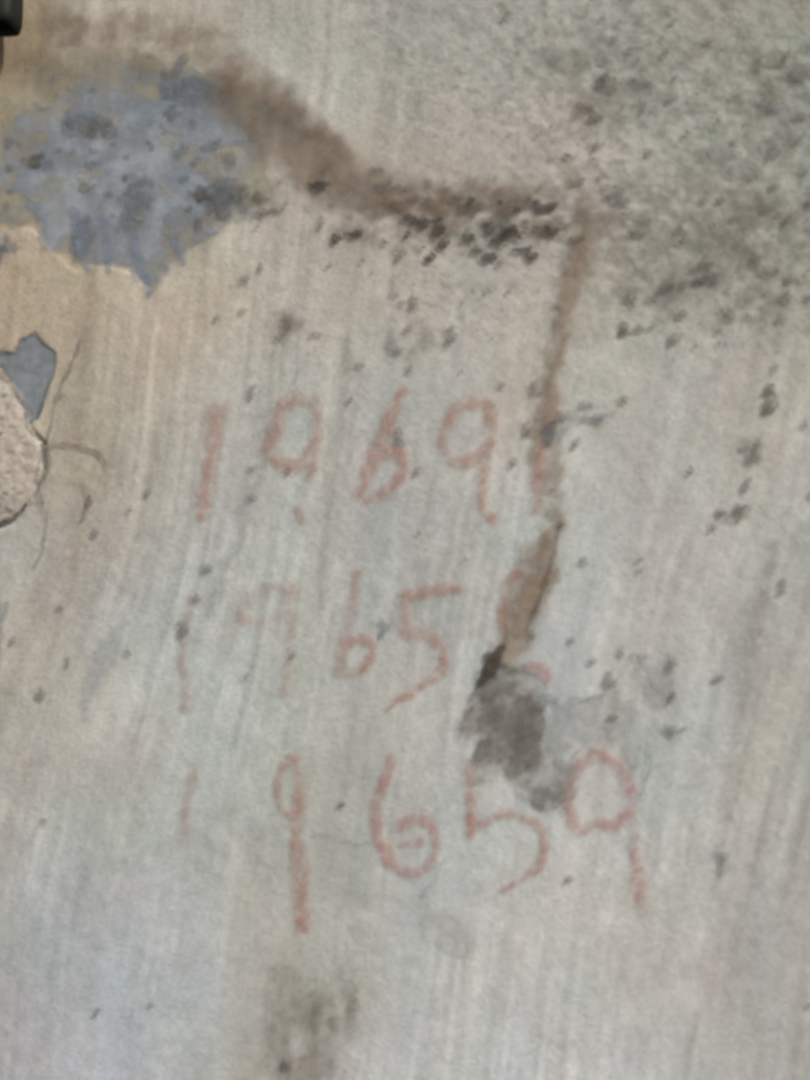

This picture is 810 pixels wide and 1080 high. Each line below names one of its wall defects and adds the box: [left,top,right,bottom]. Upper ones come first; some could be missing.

peeling [0,50,274,295]
water stain [218,56,570,265]
flaking render [0,333,57,527]
peeling [462,645,574,811]